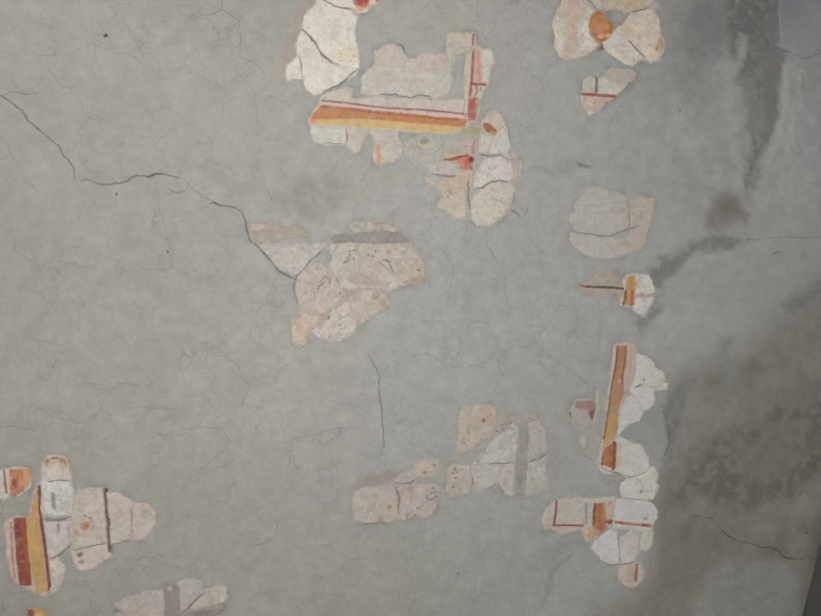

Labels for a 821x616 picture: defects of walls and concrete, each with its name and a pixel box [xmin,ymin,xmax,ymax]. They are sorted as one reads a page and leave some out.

crack [0,95,177,193]
water stain [650,0,821,288]
crack [210,201,301,280]
water stain [662,366,821,521]
crack [697,515,816,561]